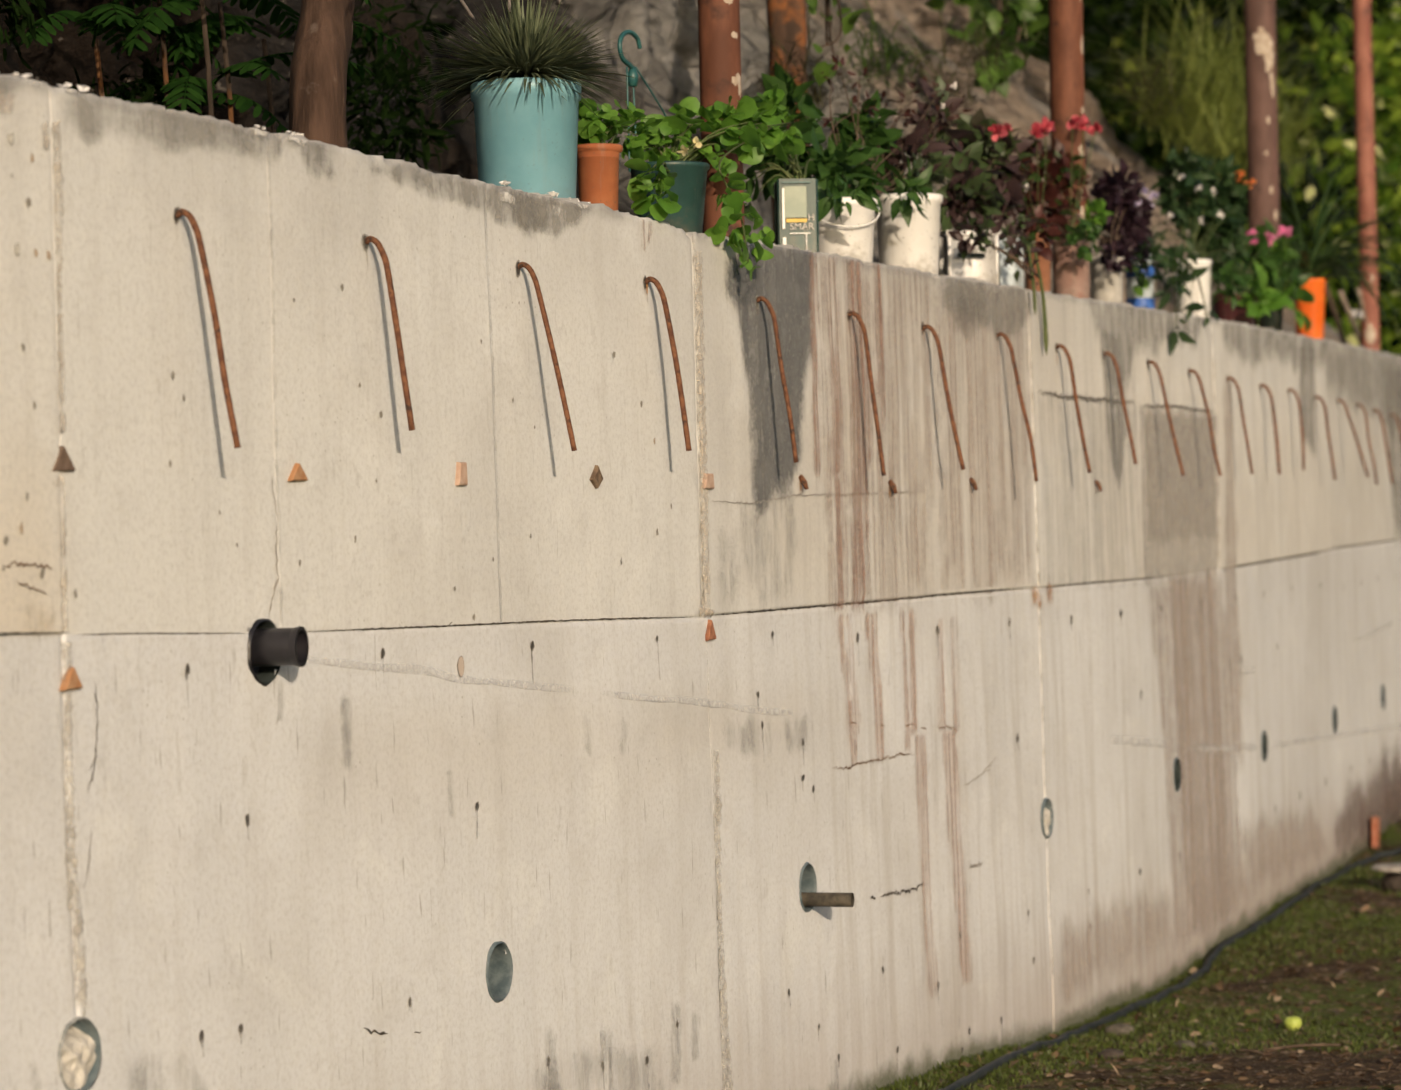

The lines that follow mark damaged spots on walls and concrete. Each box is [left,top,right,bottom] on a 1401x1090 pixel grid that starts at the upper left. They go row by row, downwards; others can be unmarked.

water stain [728,244,813,514]
crack [0,479,279,635]
rust [810,259,894,707]
crack [834,722,957,770]
crack [871,882,925,900]